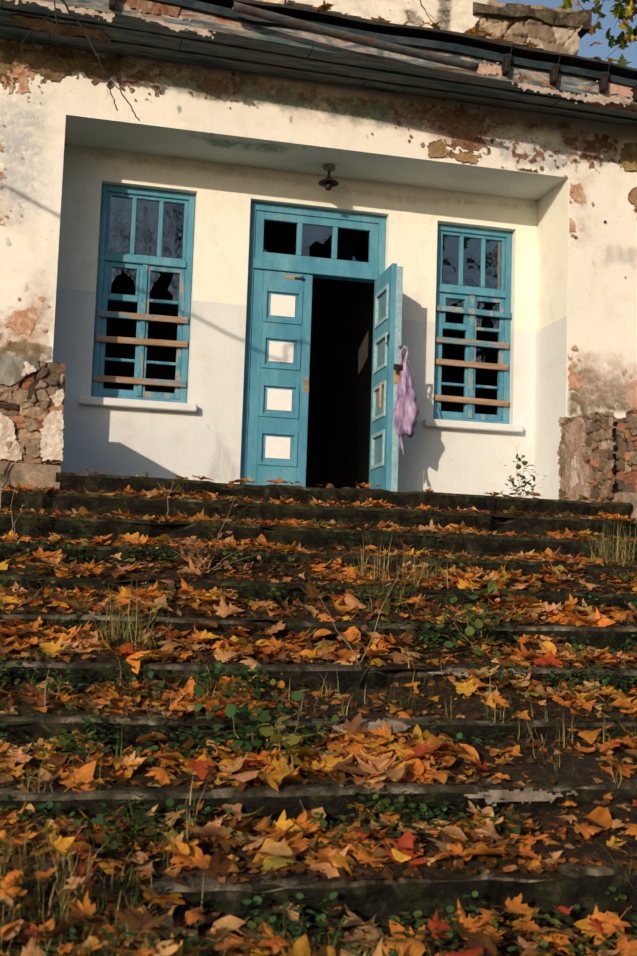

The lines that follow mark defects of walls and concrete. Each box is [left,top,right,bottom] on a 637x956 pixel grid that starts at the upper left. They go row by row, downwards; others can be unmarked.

spalling [0,40,170,104]
peeling [181,65,246,109]